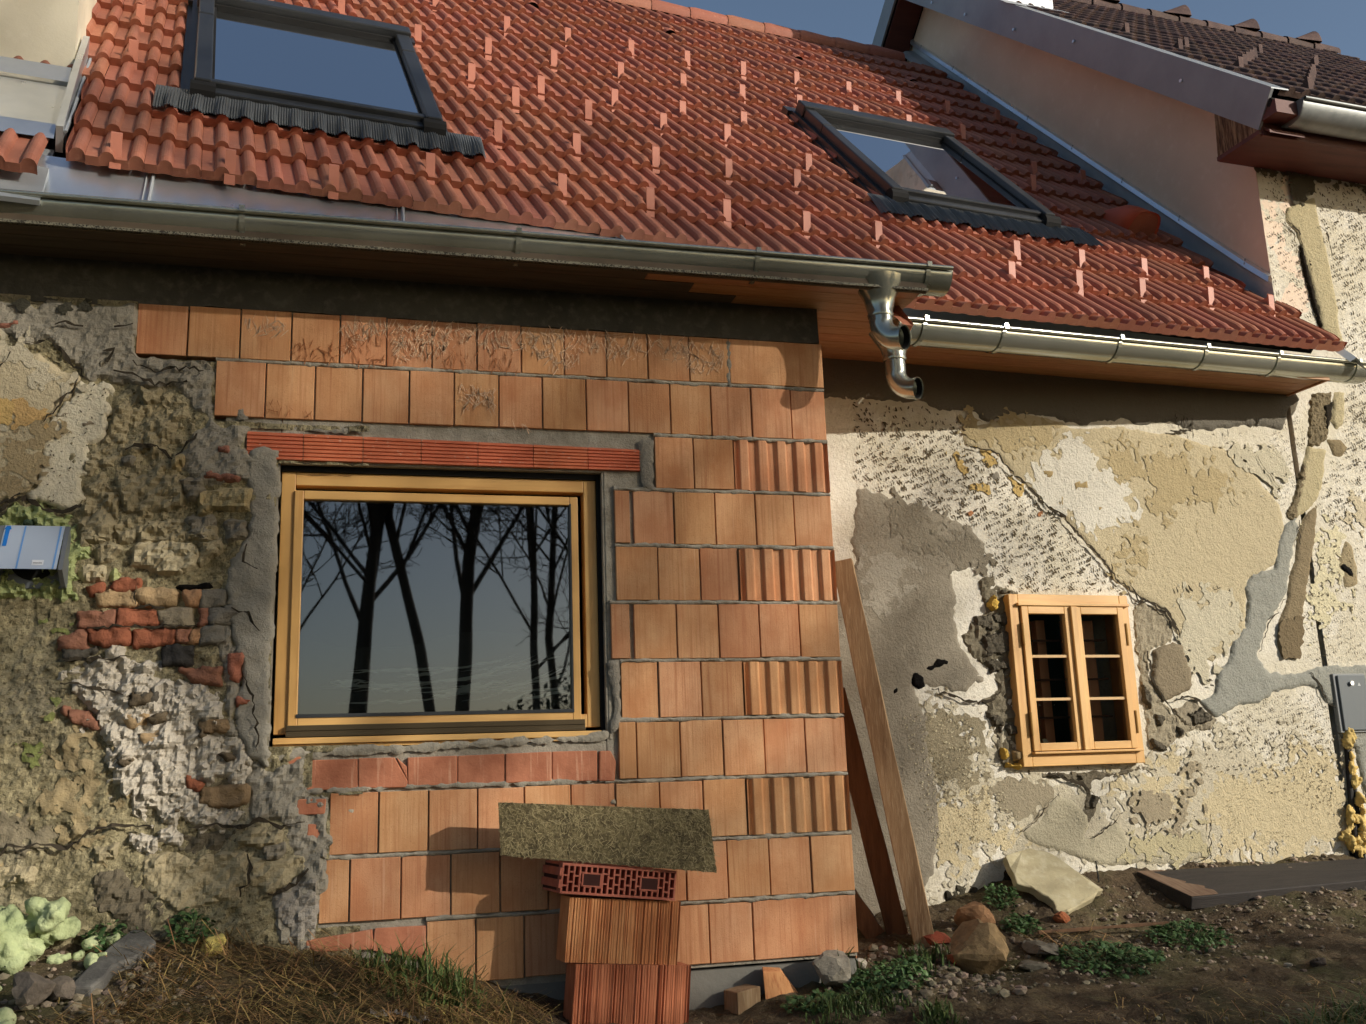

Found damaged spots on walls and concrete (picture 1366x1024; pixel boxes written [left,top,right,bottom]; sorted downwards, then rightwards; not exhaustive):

spalling [1307,392,1347,457]
spalling [0,320,253,739]
peeling [1024,430,1143,541]
crack [966,444,1220,638]
spalling [116,689,168,767]
spalling [961,576,1140,823]
crack [1147,651,1215,722]
peeling [1132,581,1248,752]
flaking render [174,775,251,812]
spalling [0,864,38,890]
spalling [91,827,305,940]
spalling [944,870,1012,901]